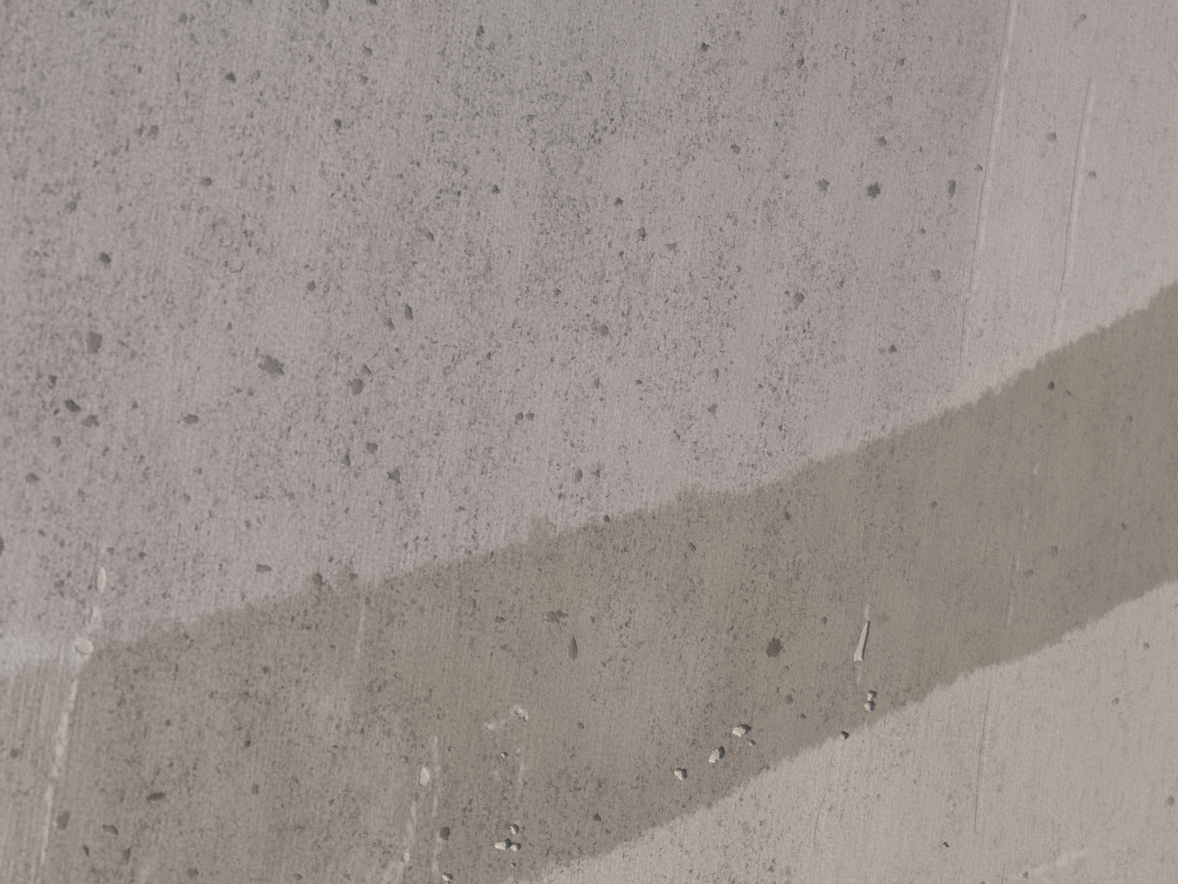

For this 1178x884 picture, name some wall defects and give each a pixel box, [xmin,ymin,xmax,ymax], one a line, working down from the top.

damp [0,624,82,884]
damp [0,0,1070,634]
damp [13,221,1178,884]